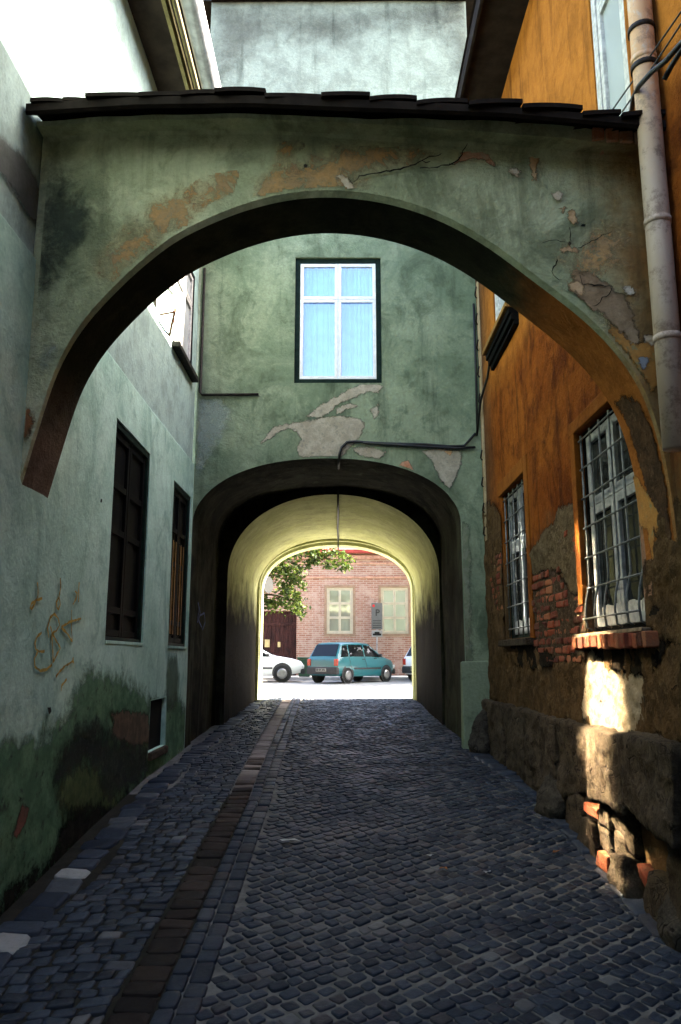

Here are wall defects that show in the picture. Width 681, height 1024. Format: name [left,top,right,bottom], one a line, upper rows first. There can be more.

peeling [257,140,425,196]
crack [349,145,467,183]
peeling [100,170,239,279]
crack [543,227,613,306]
flaking render [568,268,657,393]
flaking render [261,385,386,459]
flaking render [422,448,463,488]
flaking render [482,394,681,743]
leakage [0,715,151,916]